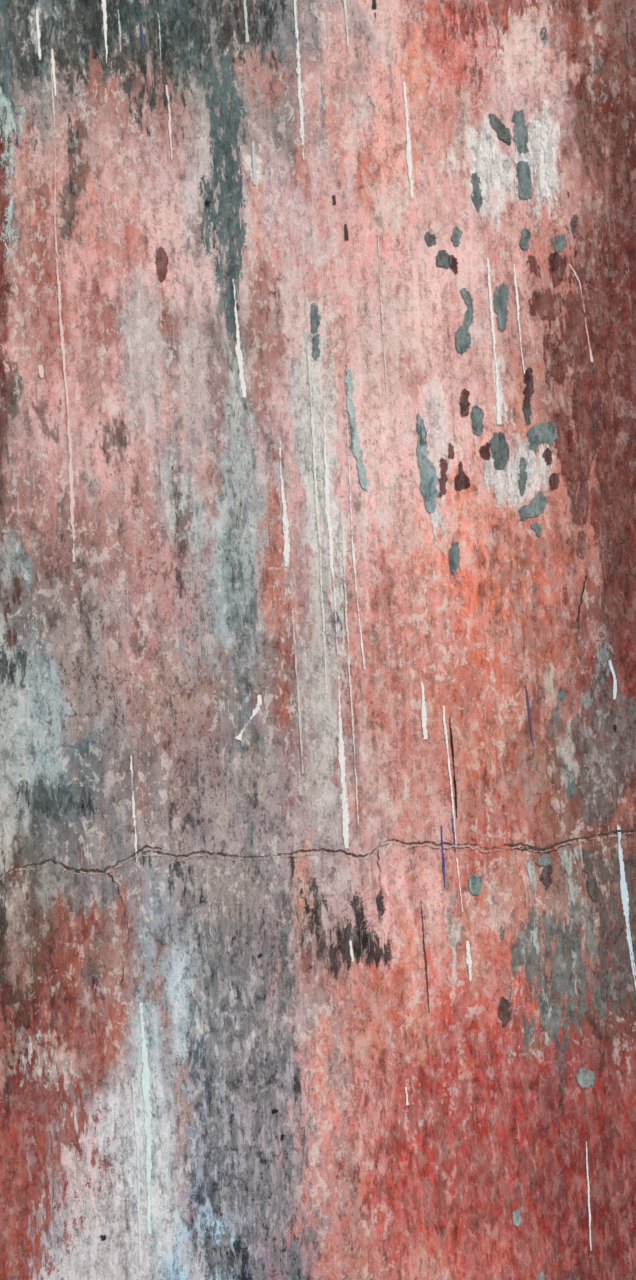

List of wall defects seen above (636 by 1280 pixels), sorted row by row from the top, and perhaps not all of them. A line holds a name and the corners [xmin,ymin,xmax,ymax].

peeling [424,226,463,274]
peeling [455,288,474,353]
peeling [460,3,636,696]
peeling [416,414,470,513]
peeling [449,541,460,576]
crack [577,575,588,622]
crack [0,720,636,985]